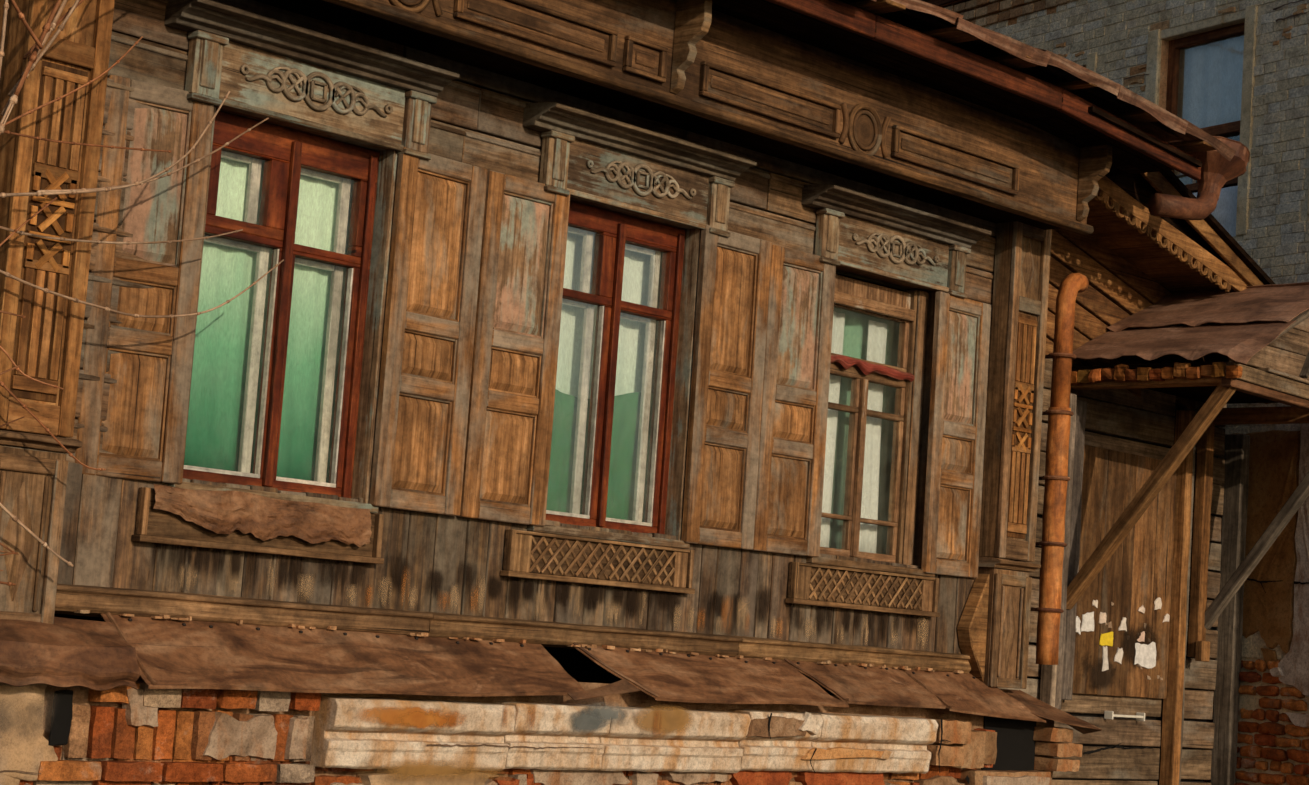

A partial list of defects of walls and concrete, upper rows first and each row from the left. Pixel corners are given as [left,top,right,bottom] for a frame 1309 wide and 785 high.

peeling [1218,423,1309,785]
spalling [122,688,158,727]
spalling [203,712,309,760]
peeling [330,712,899,785]